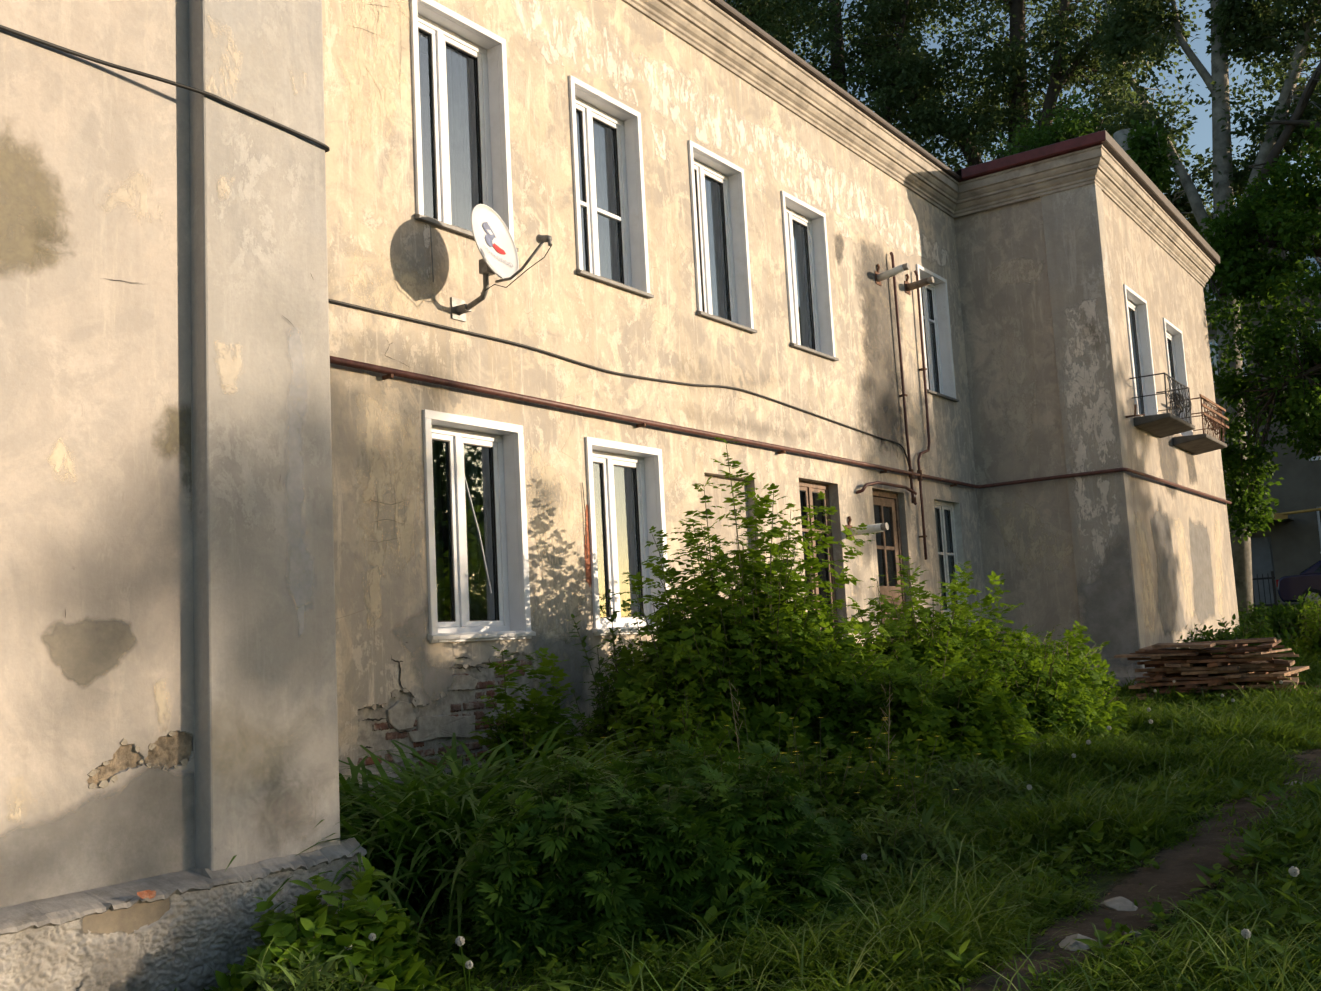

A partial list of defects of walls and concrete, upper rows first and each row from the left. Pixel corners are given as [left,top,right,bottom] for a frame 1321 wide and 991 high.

leakage [0,137,61,270]
leakage [858,250,901,443]
peeling [1064,299,1121,585]
spalling [87,682,192,789]
spalling [357,654,540,774]
spalling [137,889,156,899]